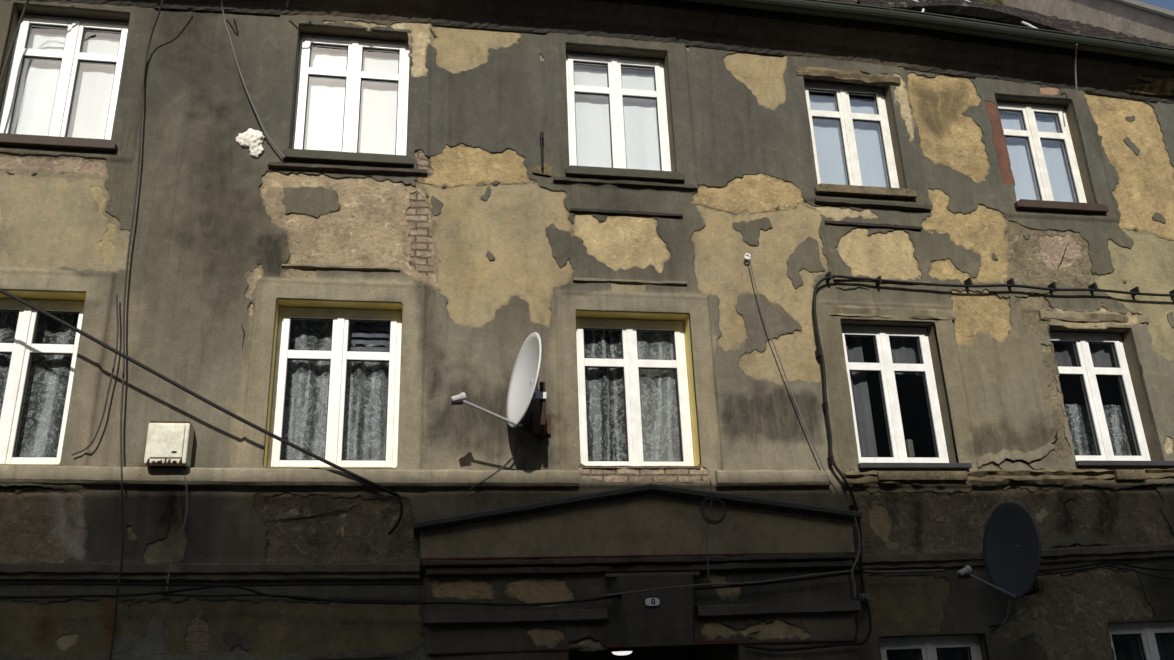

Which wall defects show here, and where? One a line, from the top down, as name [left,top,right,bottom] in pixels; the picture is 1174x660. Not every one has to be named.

flaking render [321,20,521,77]
flaking render [723,52,789,110]
flaking render [1040,87,1059,96]
flaking render [893,73,1015,186]
flaking render [0,152,131,273]
flaking render [259,143,671,327]
flaking render [244,264,264,316]
flaking render [691,92,1174,461]
crack [976,433,1058,470]
flaking render [0,487,87,563]
flaking render [701,619,811,640]